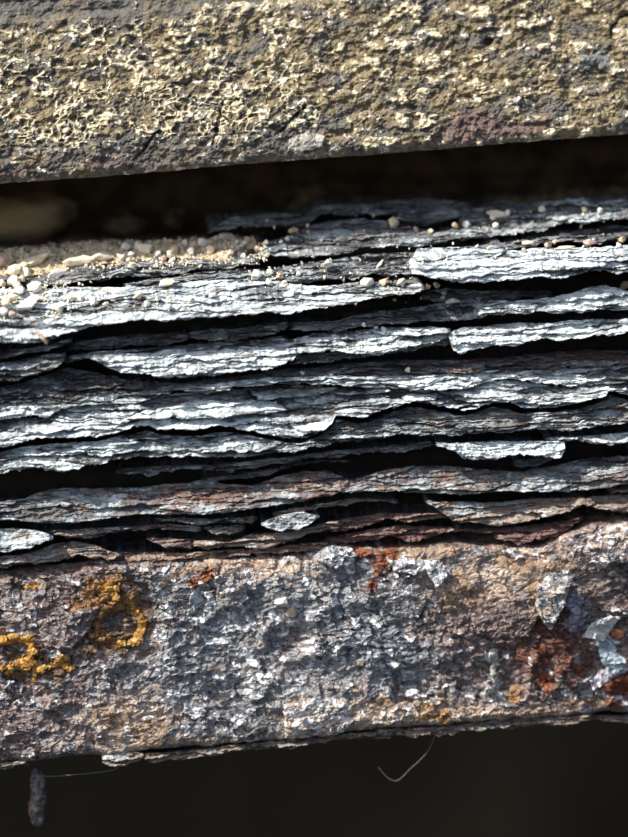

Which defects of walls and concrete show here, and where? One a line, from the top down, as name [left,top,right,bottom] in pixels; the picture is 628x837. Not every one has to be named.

spalling [486,210,509,218]
spalling [47,247,114,278]
spalling [360,278,406,287]
spalling [16,295,39,310]
rust [0,196,628,684]
rust [92,600,628,767]